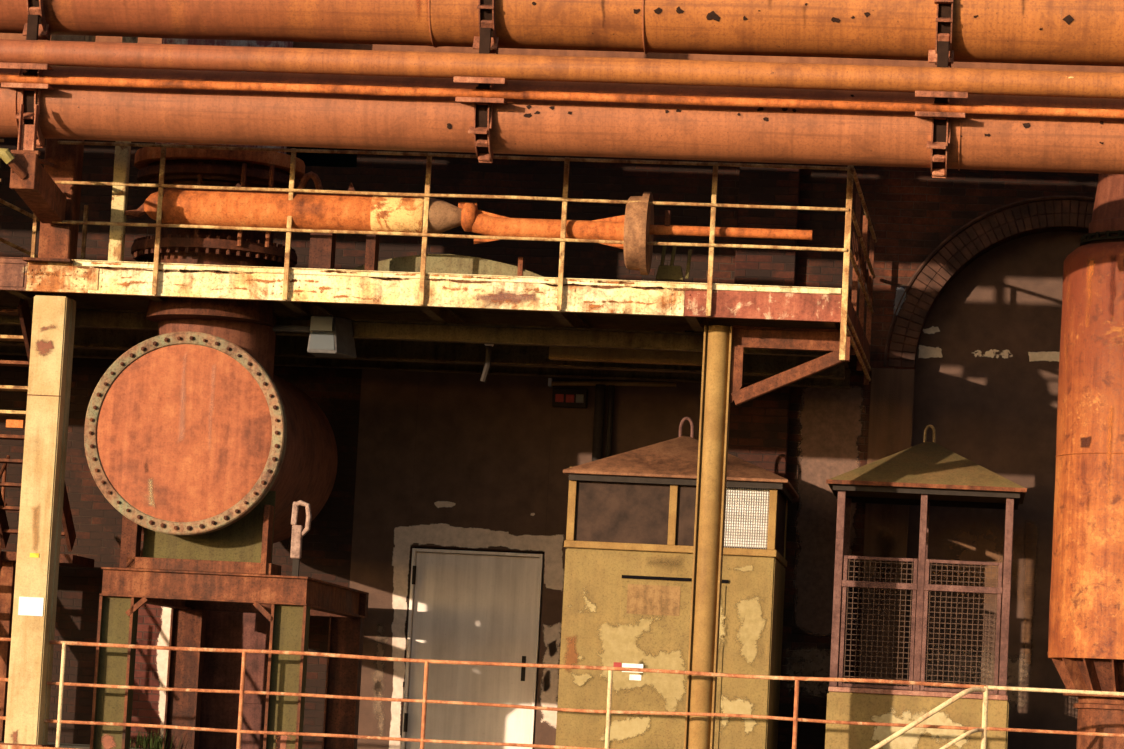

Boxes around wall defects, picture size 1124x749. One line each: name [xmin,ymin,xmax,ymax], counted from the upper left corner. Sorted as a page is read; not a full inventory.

corrosion [25,262,376,300]
corrosion [369,274,717,308]
peeling [918,326,943,359]
peeling [972,349,1013,359]
peeling [1028,351,1060,362]
peeling [718,595,766,664]
peeling [540,588,687,728]
peeling [599,716,651,742]
peeling [719,696,757,734]
peeling [870,707,970,749]